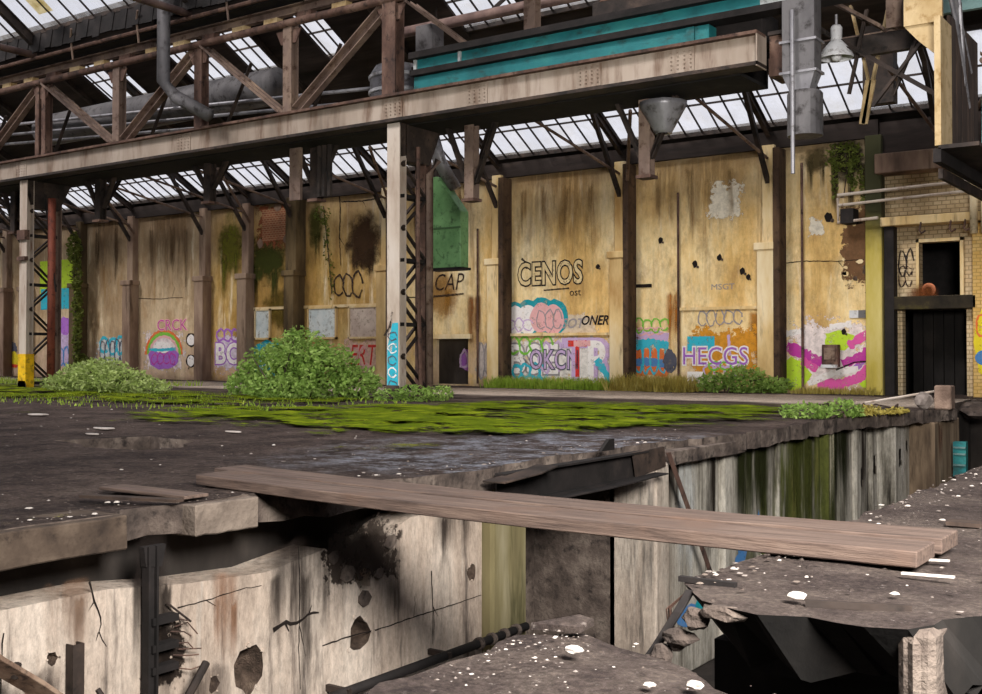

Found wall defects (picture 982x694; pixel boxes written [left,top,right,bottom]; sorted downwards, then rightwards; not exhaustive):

leakage [345,211,381,272]
peeling [706,179,745,221]
peeling [808,200,866,289]
spalling [0,578,142,694]
crack [88,581,107,647]
spalling [158,511,482,694]
crack [273,544,481,689]